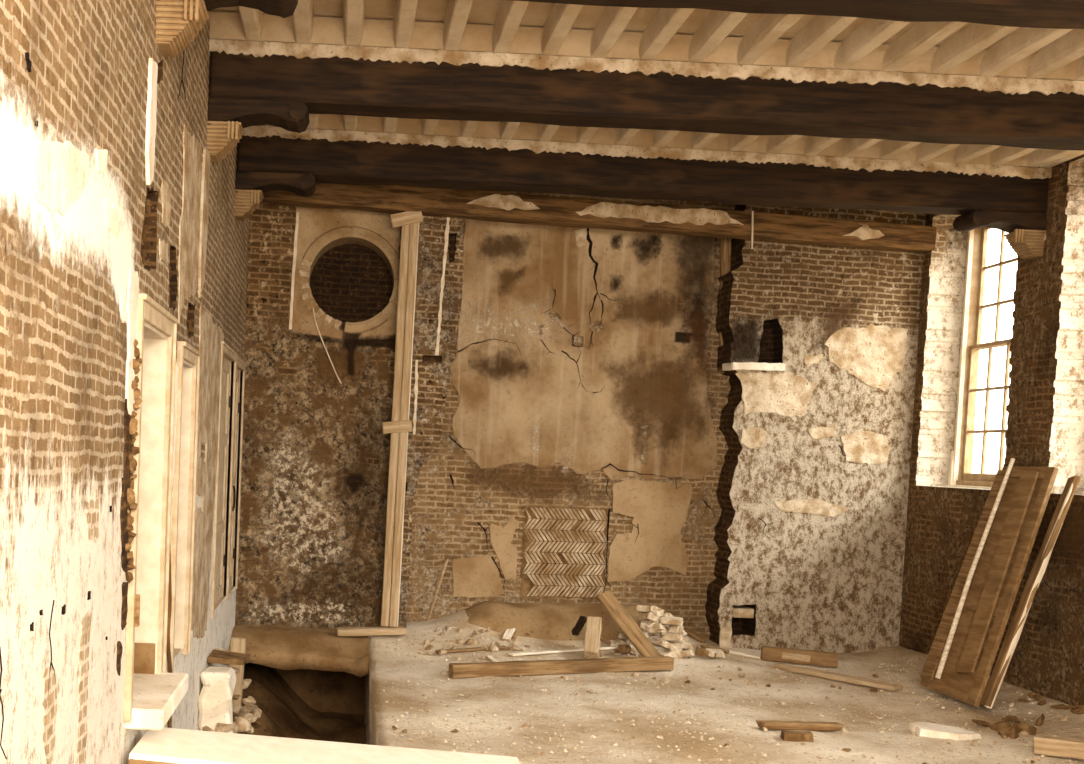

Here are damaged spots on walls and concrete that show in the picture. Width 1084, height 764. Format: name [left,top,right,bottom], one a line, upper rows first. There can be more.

peeling [22,121,108,238]
crack [458,228,615,393]
water stain [617,291,687,325]
peeling [422,218,718,582]
water stain [610,358,710,459]
peeling [735,313,908,449]
peeling [808,425,889,465]
peeling [452,515,518,598]
crack [0,647,8,759]
crack [46,600,56,707]